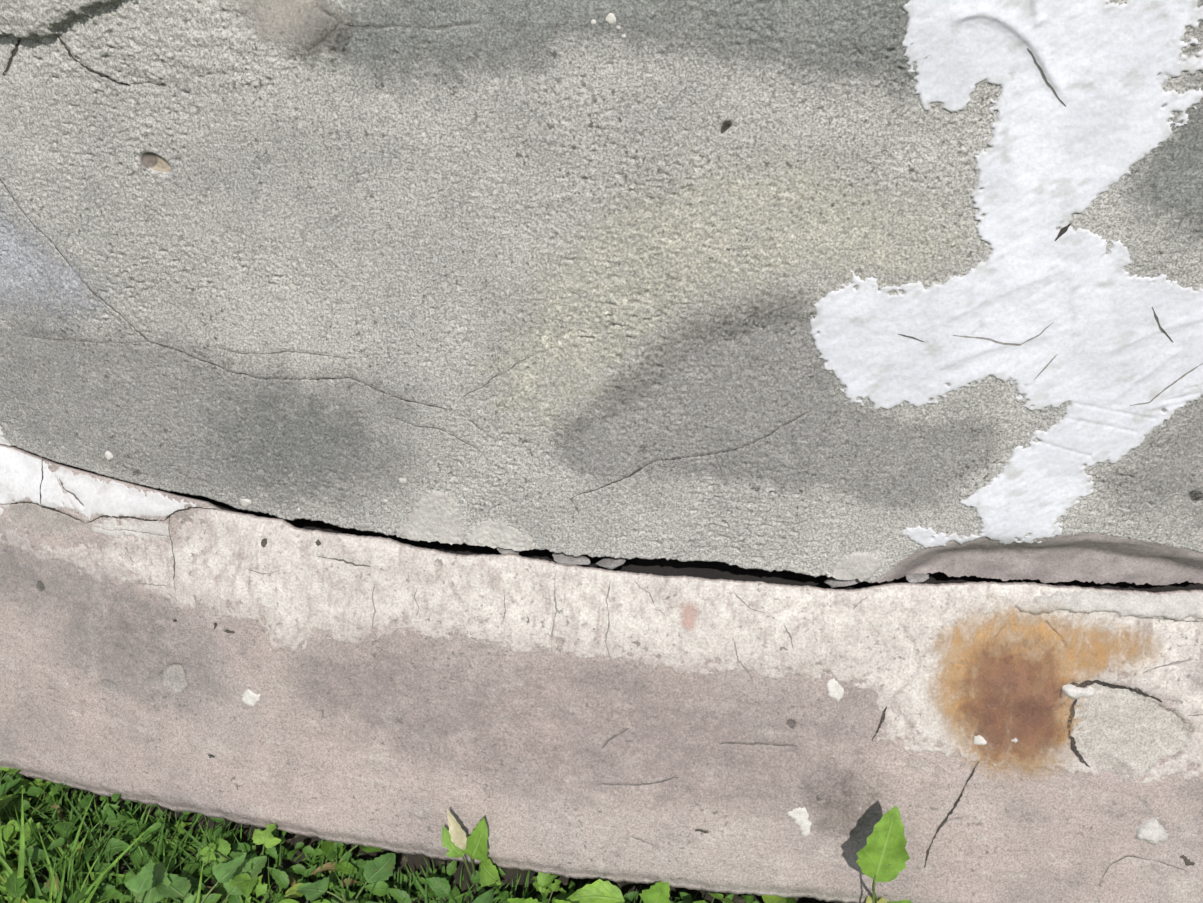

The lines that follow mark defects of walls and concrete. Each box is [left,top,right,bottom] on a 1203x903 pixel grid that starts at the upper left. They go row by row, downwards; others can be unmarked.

crack [2,38,21,76]
flaking render [0,0,121,43]
crack [56,35,163,86]
flaking render [239,0,332,51]
crack [0,179,544,453]
peeling [0,427,1203,784]
crack [1,446,1203,660]
corrosion [939,618,1131,768]
crack [1143,659,1192,673]
crack [924,761,979,868]